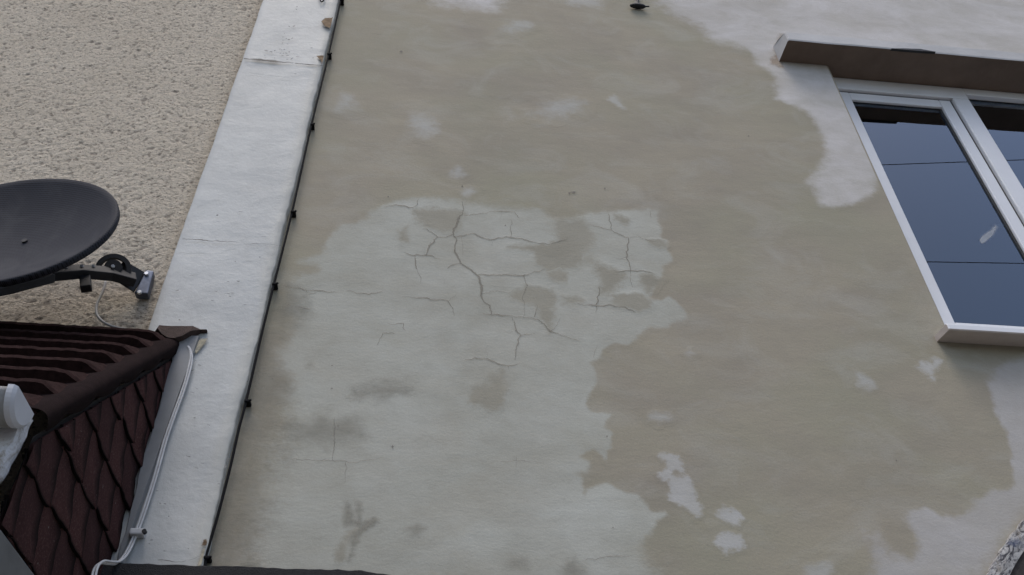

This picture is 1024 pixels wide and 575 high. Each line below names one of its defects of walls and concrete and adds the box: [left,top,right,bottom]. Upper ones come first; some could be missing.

damp [418,0,541,40]
damp [513,91,631,128]
damp [635,0,1024,212]
crack [288,200,576,369]
damp [207,162,692,575]
crack [588,214,654,311]
damp [849,350,1024,575]